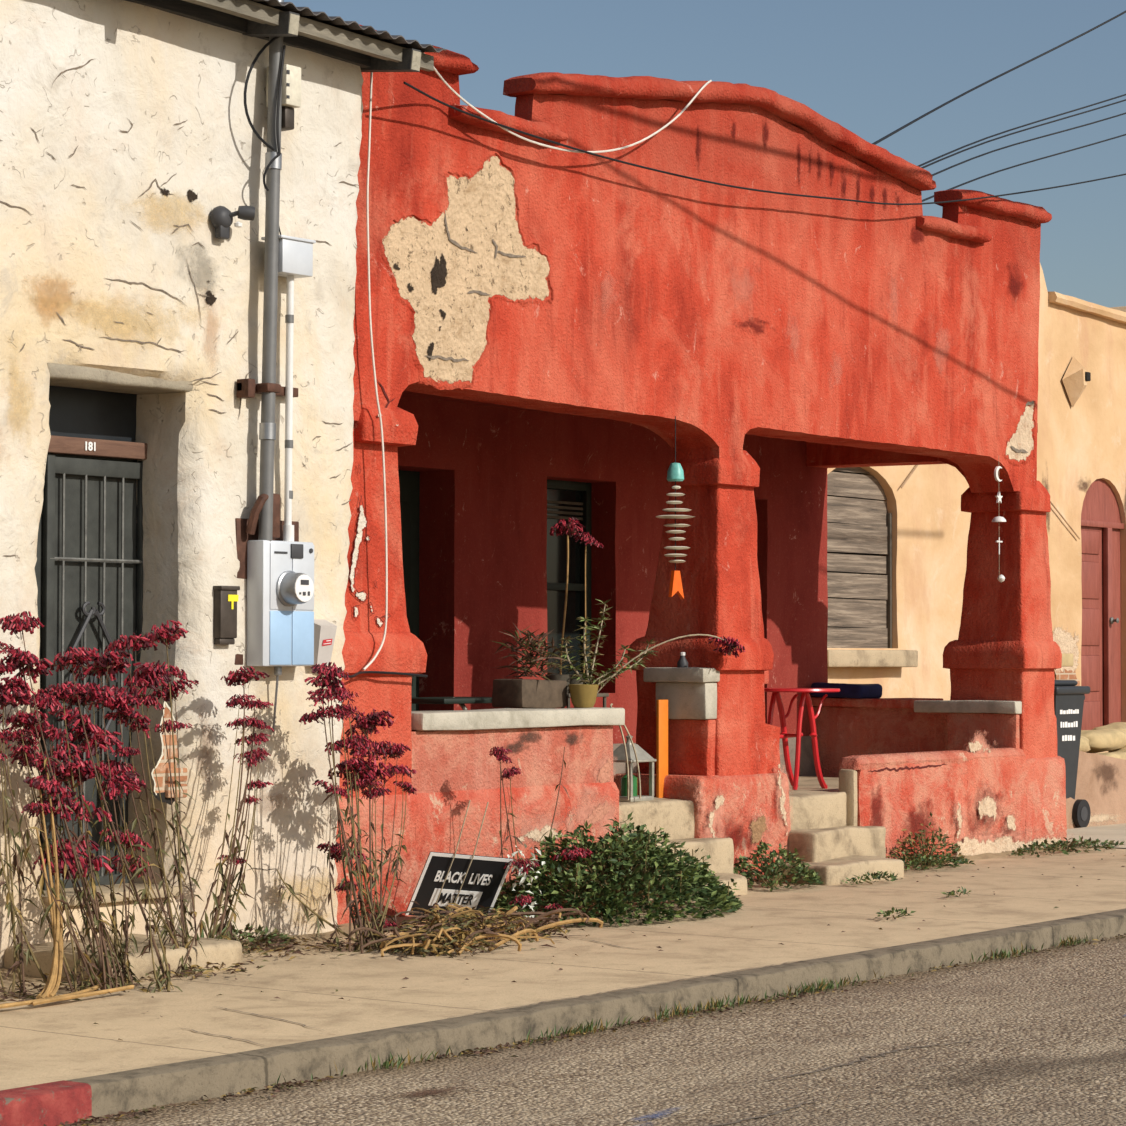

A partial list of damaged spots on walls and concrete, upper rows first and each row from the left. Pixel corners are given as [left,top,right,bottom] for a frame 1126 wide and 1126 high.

flaking render [378,149,554,390]
spalling [1002,398,1036,467]
peeling [349,496,390,628]
peeling [954,786,1063,856]